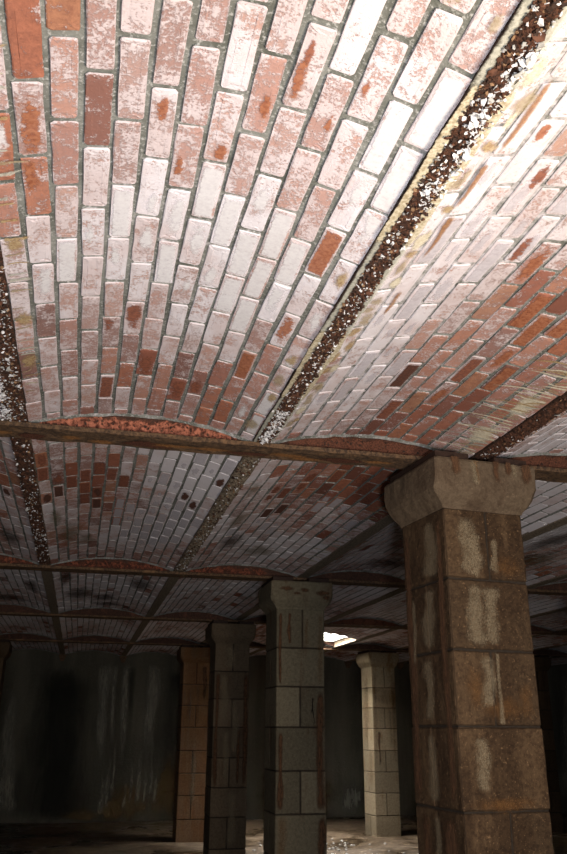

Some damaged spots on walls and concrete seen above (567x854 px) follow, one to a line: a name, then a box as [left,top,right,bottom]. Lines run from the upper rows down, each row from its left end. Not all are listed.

corrosion [316,694,326,854]